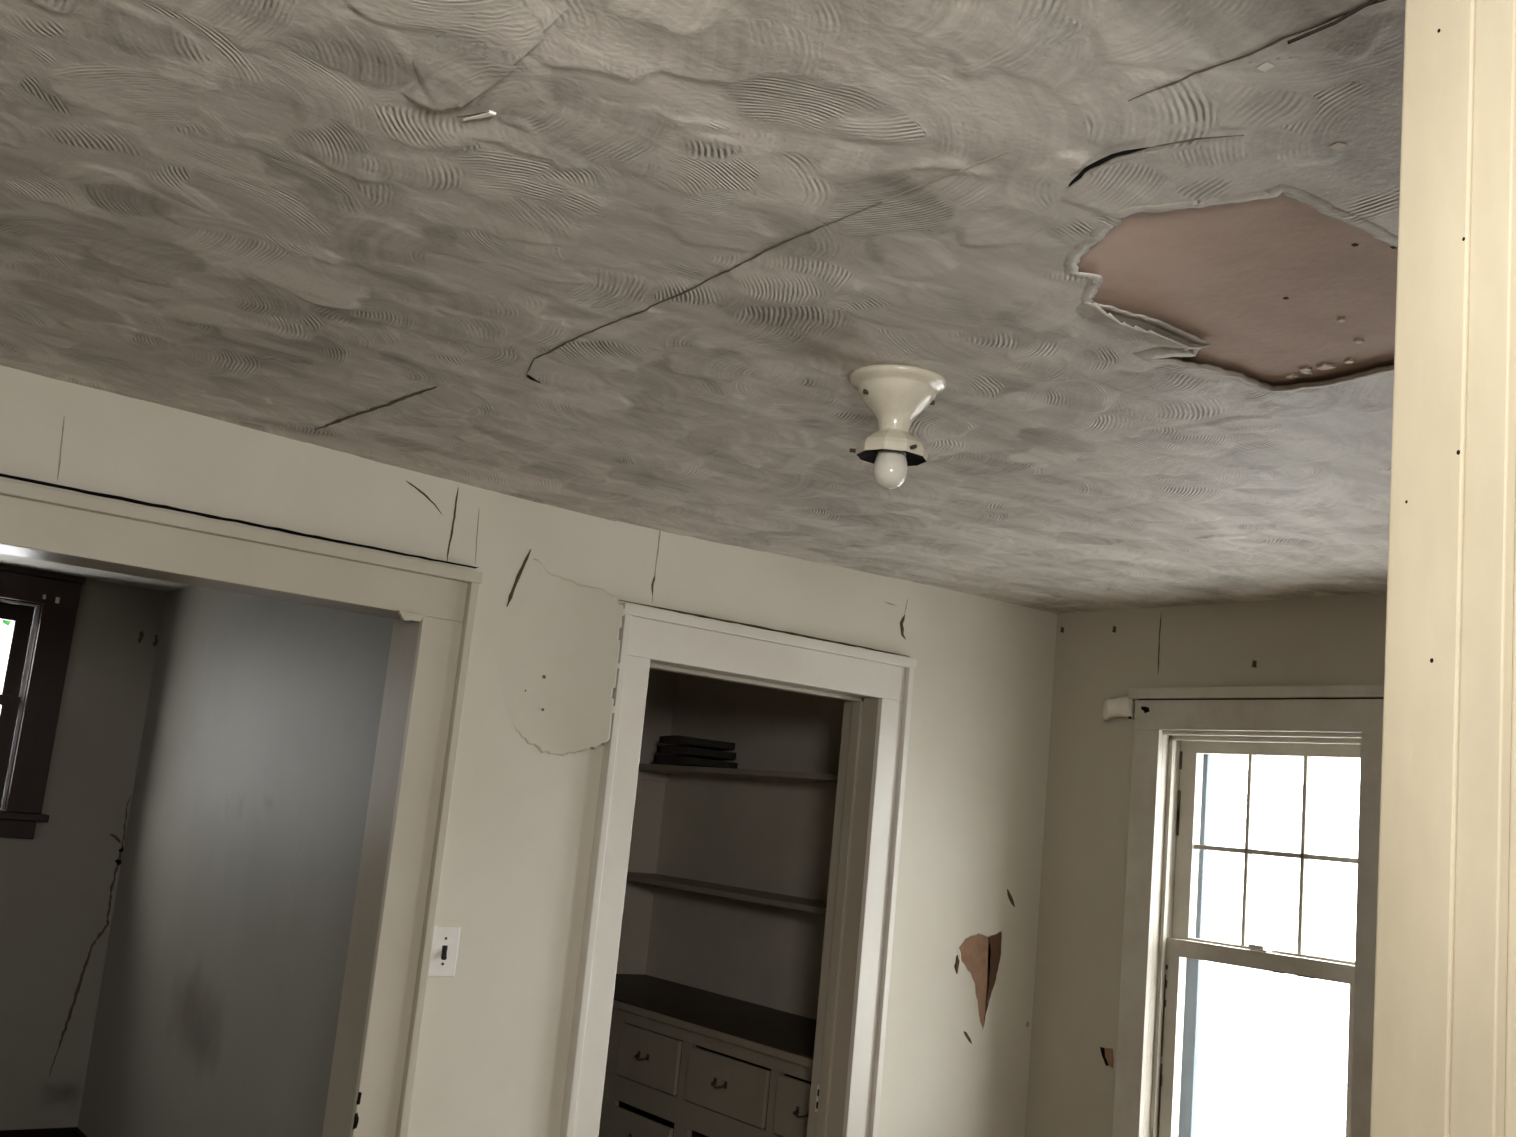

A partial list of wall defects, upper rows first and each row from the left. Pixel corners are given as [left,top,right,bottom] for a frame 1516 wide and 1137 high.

crack [1128,0,1387,101]
crack [527,151,1009,383]
flaking render [1063,184,1398,392]
crack [314,387,436,430]
crack [0,420,479,568]
crack [49,798,130,1076]
peeling [954,928,1004,1044]